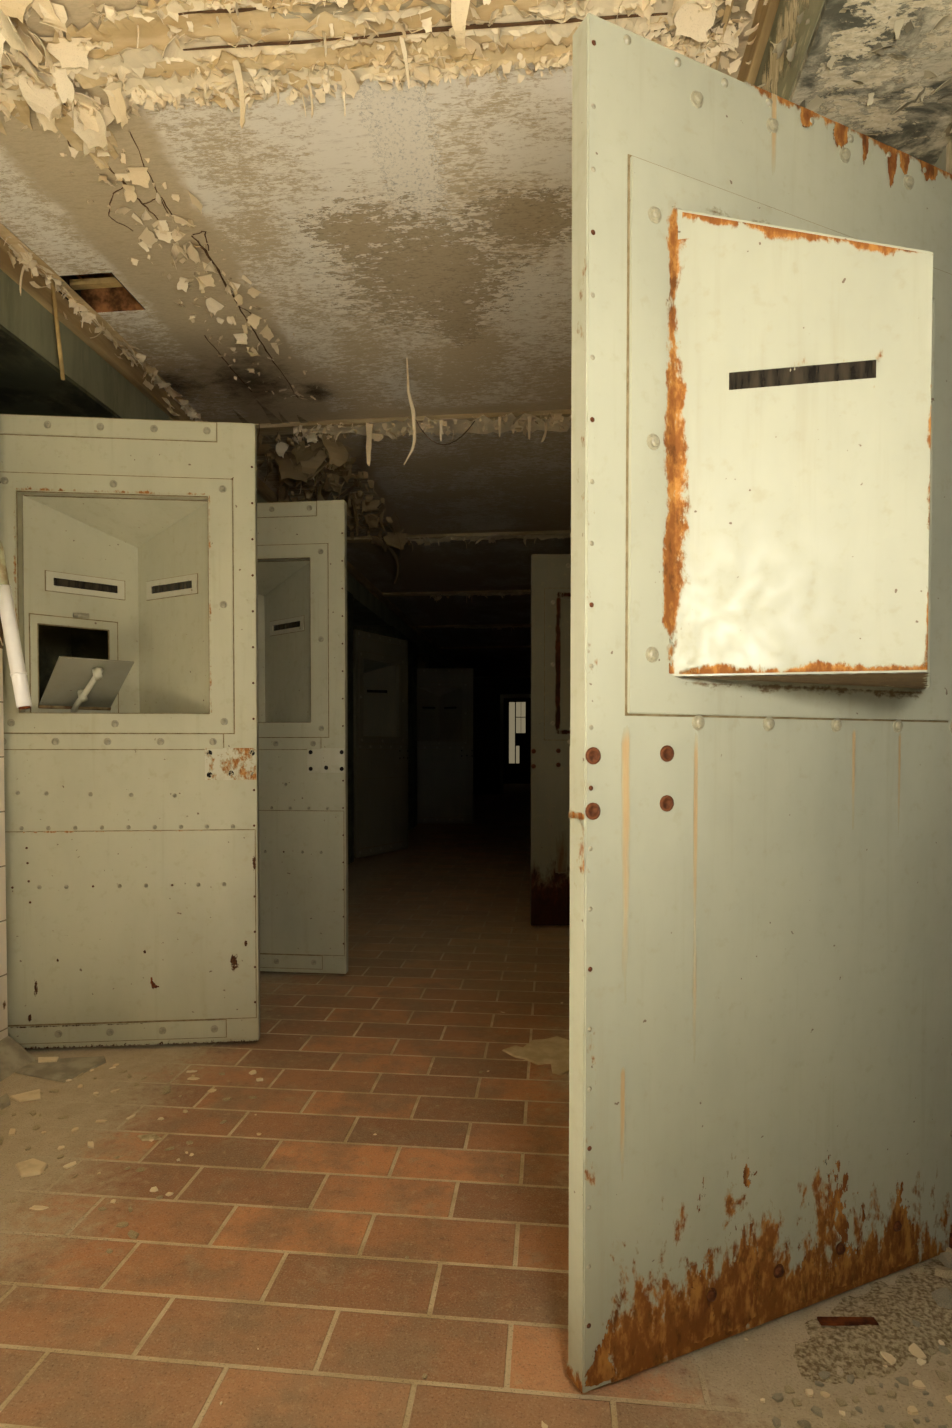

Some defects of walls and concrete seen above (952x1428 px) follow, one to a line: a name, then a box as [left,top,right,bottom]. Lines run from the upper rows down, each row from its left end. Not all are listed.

rust [745,81,952,188]
peeling [799,0,952,174]
peeling [0,0,810,583]
water stain [286,168,572,355]
rust [661,202,933,674]
rust [205,748,256,780]
rust [531,811,590,927]
rust [567,1150,952,1393]